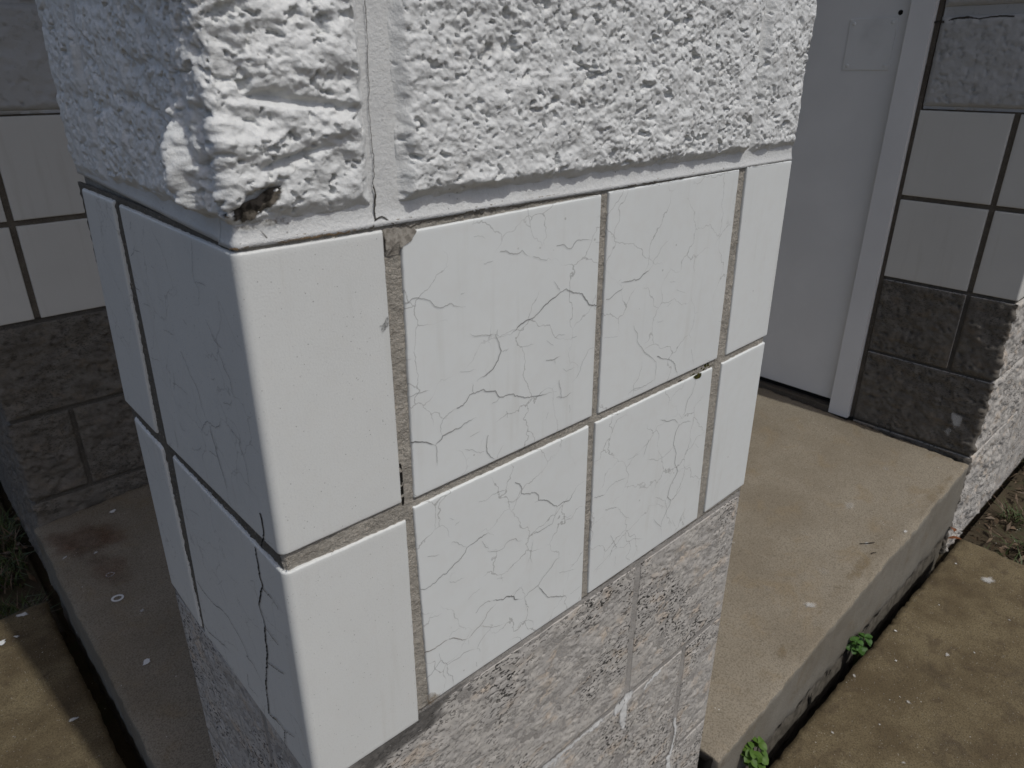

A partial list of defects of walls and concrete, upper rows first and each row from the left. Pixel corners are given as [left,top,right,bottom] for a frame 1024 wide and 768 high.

crack [230,0,784,250]
crack [411,289,597,444]
crack [199,513,294,742]